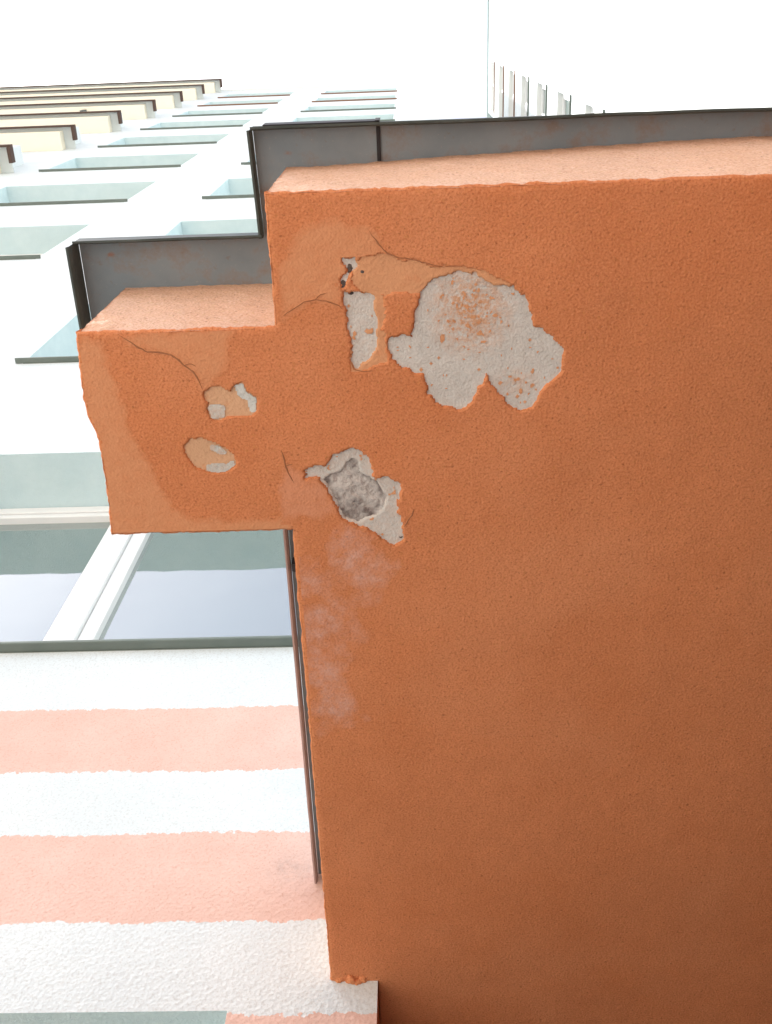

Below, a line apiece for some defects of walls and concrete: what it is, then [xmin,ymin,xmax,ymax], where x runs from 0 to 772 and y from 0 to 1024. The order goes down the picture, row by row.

crack [118,334,203,390]
peeling [78,330,404,545]
crack [283,293,339,316]
peeling [277,214,564,410]